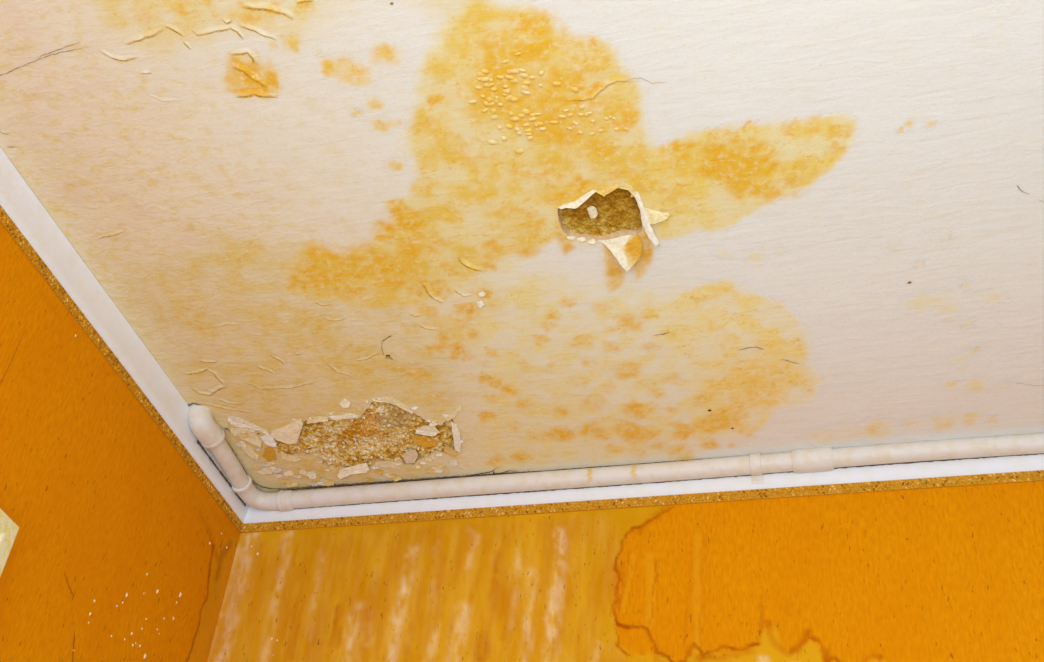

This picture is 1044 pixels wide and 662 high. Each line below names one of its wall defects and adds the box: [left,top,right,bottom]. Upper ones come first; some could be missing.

peeling [242,0,313,20]
crack [1,43,91,75]
peeling [101,17,279,98]
water stain [73,0,862,492]
spalling [557,183,670,271]
spalling [228,397,473,487]
water stain [184,505,892,662]